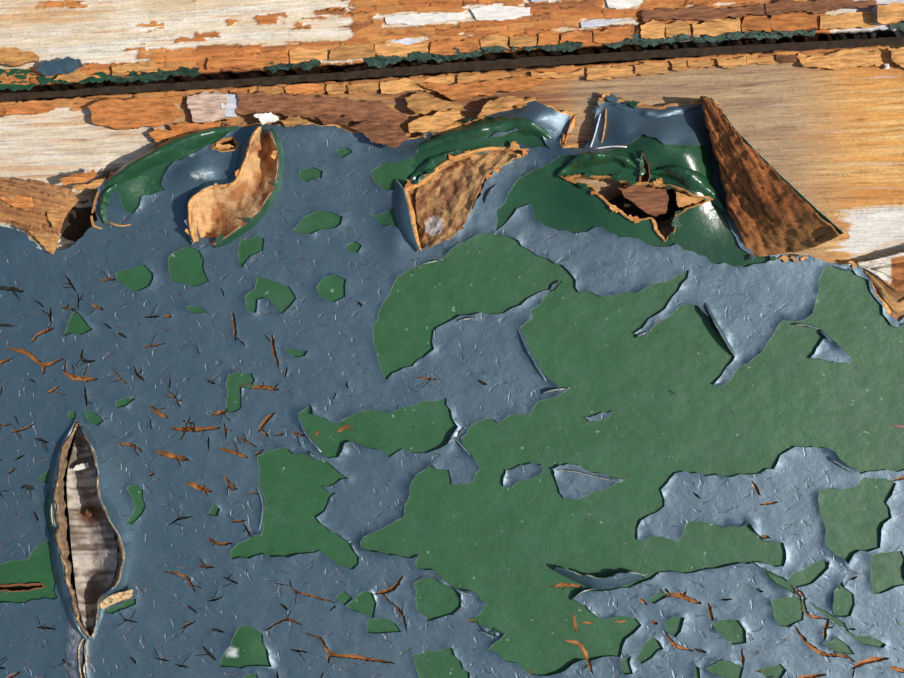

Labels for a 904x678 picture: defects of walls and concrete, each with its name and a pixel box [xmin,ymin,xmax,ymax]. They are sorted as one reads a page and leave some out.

peeling [385,0,548,25]
peeling [581,0,640,28]
peeling [387,38,418,46]
peeling [116,125,225,213]
peeling [168,247,209,287]
crack [0,271,172,407]
peeling [226,130,904,678]
crack [116,288,355,668]
peeling [0,542,57,603]
crack [37,617,57,630]
crack [0,658,20,678]
crack [52,633,90,678]